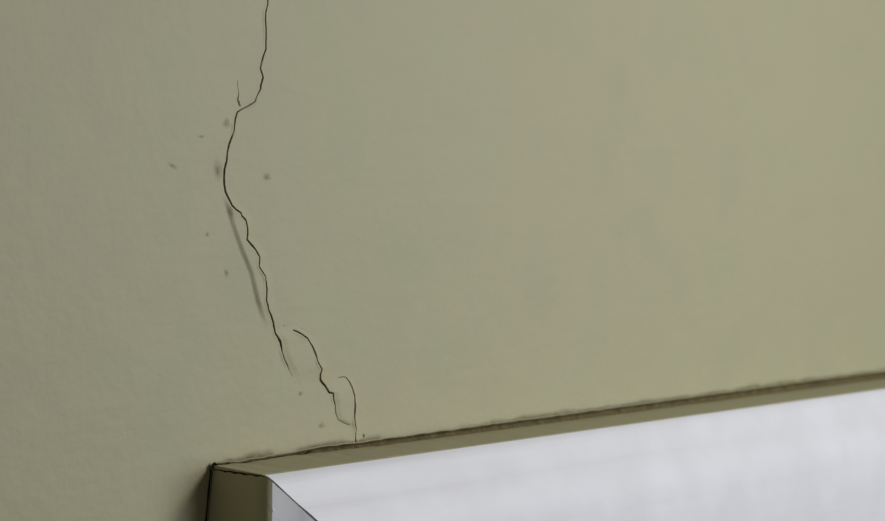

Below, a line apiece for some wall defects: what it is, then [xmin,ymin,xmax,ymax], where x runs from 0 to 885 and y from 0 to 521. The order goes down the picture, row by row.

crack [205,0,885,521]